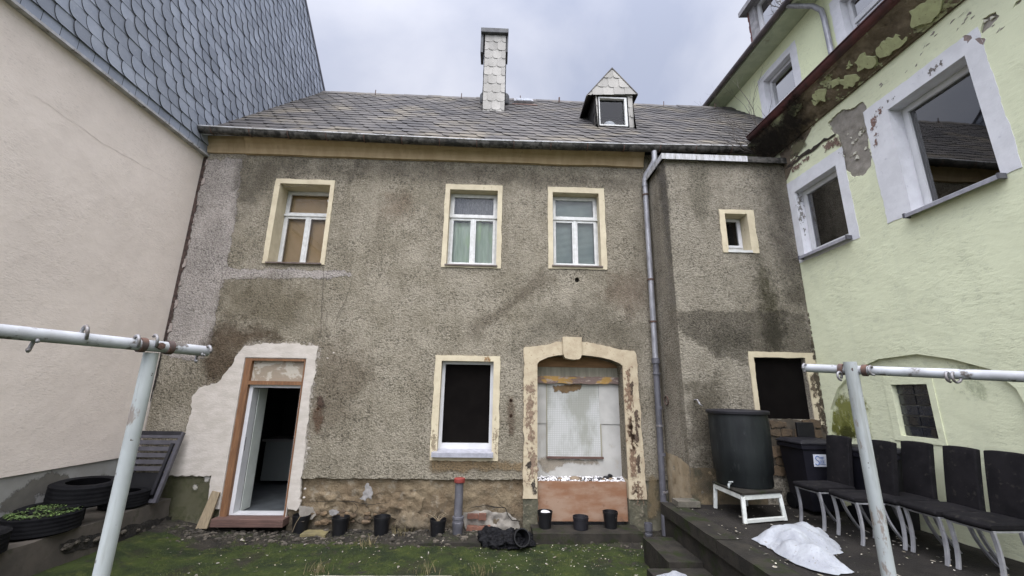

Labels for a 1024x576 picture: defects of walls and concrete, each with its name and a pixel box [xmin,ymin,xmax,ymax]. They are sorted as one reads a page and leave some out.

peeling [795,0,943,116]
spalling [950,12,1005,45]
spalling [823,96,895,177]
leakage [761,268,781,350]
leakage [205,324,276,382]
peeling [509,381,539,495]
peeling [622,367,645,505]
spalling [311,489,429,525]
spalling [463,510,520,531]